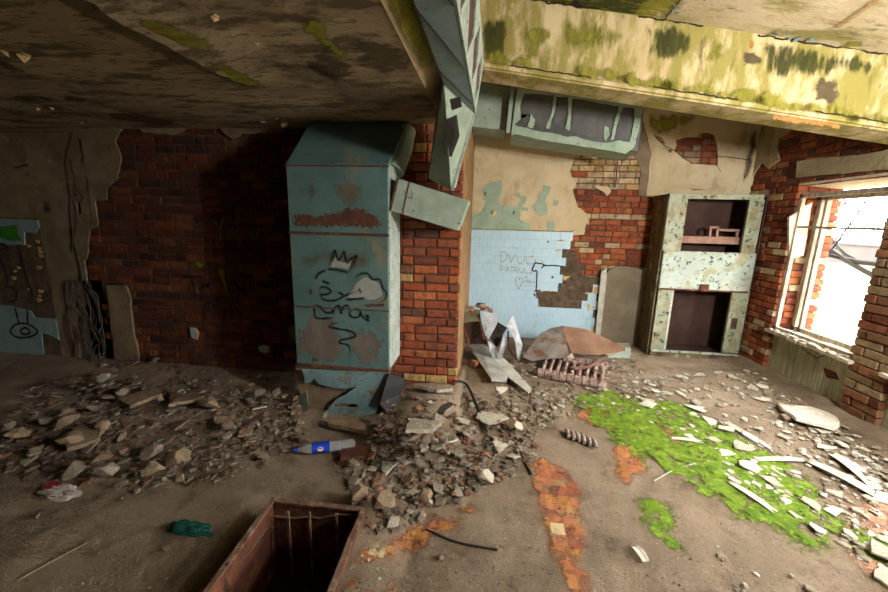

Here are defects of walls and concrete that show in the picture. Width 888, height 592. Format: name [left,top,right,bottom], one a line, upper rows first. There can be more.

crack [532,0,597,10]
crack [639,0,703,27]
damp [650,27,690,57]
crack [758,35,888,55]
damp [744,45,871,103]
flaking render [675,133,717,166]
flaking render [472,87,664,320]
flaking render [38,118,385,372]